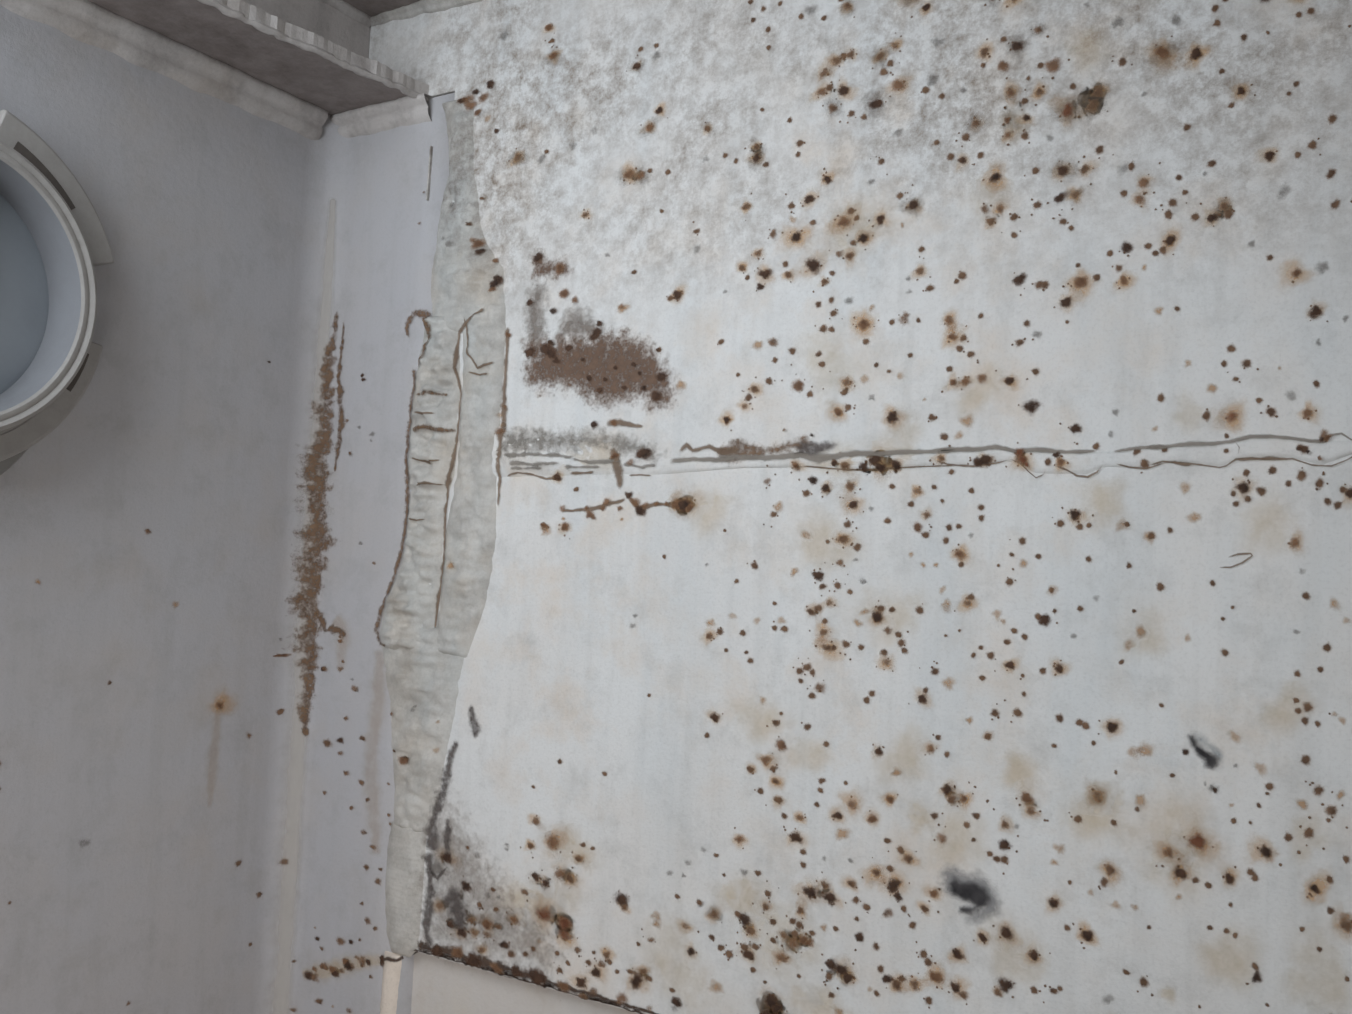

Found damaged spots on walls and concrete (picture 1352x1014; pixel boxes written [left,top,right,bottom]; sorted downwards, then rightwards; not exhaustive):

rust [523,253,684,410]
rust [273,312,373,735]
crack [374,309,593,646]
rust [540,448,693,539]
rust [680,419,867,498]
crack [630,433,1352,478]
crack [1222,553,1253,568]
rust [1202,408,1346,509]
rust [971,613,1062,740]
rust [418,888,657,1014]
rust [697,871,856,1014]
rust [797,838,950,1009]